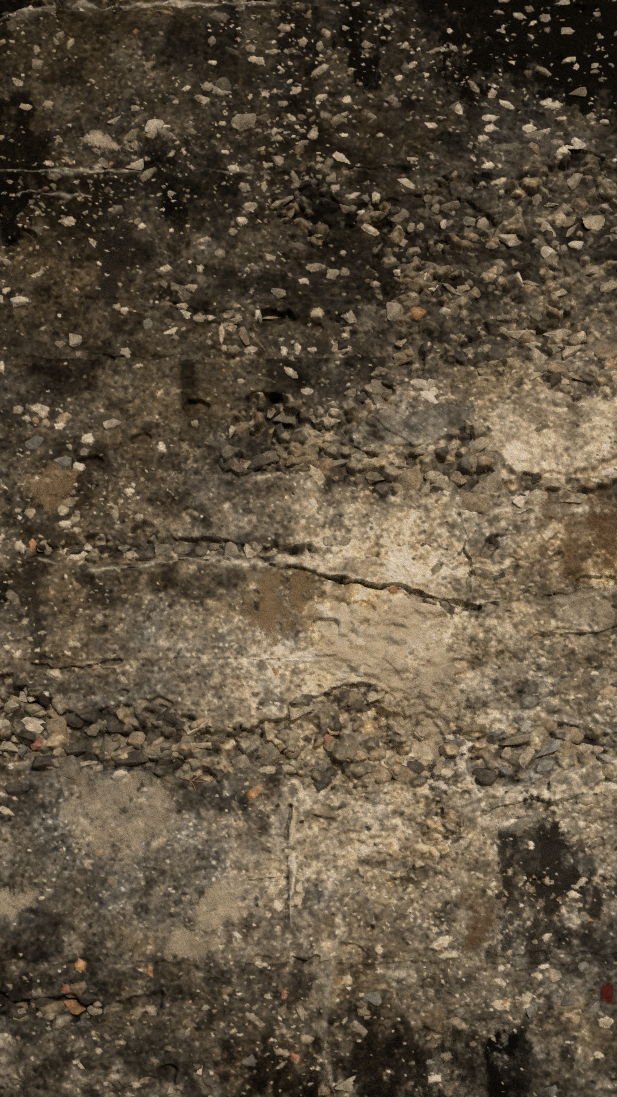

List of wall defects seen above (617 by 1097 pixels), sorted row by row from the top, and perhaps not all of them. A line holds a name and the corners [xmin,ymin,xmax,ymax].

spalling [219,113,617,503]
crack [326,512,482,613]
crack [30,658,124,674]
spalling [0,609,617,813]
spalling [0,988,233,1097]